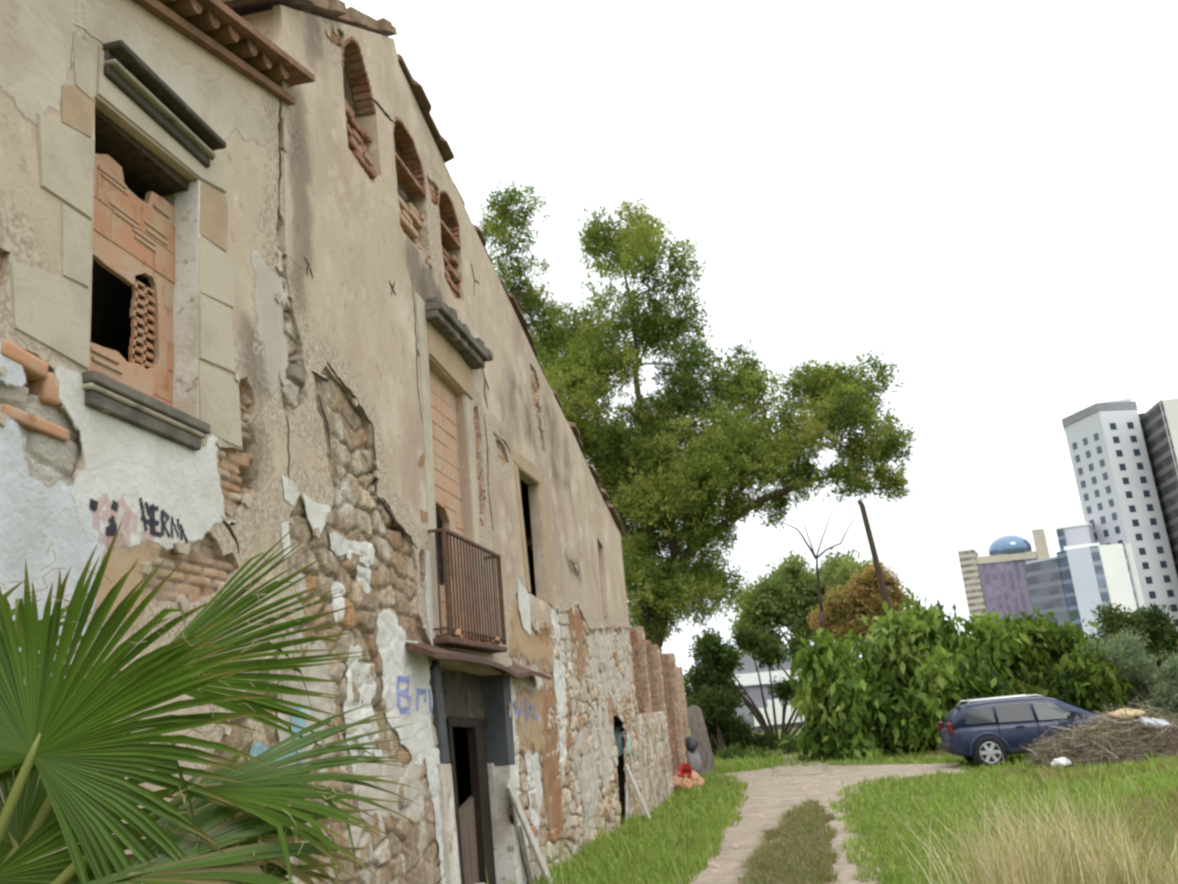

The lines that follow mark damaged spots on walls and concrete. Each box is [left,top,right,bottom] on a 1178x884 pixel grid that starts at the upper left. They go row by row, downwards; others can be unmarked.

crack [276,81,284,209]
flaking render [0,217,446,884]
crack [285,414,293,485]
flaking render [505,578,642,884]